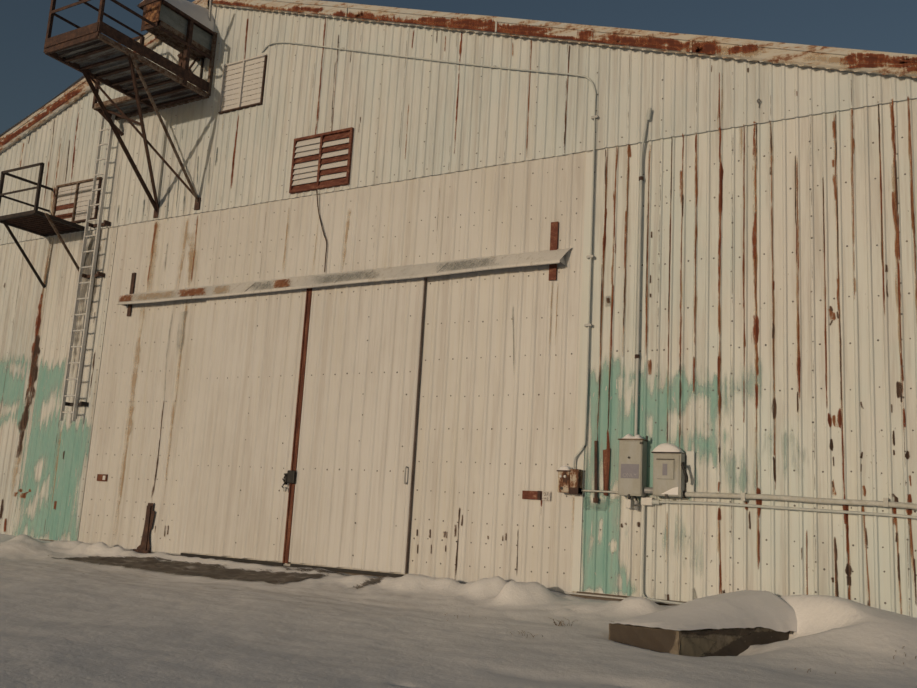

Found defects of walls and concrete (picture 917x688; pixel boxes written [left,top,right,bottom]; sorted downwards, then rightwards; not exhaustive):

rust [15,248,52,476]
peeling [0,355,91,541]
rust [119,216,226,302]
peeling [582,357,761,596]
rust [667,134,684,443]
rust [717,508,725,594]
rust [741,122,759,444]
rust [745,470,762,566]
rust [822,112,852,600]
rust [878,99,906,430]
rust [906,475,917,603]
rust [907,97,917,304]